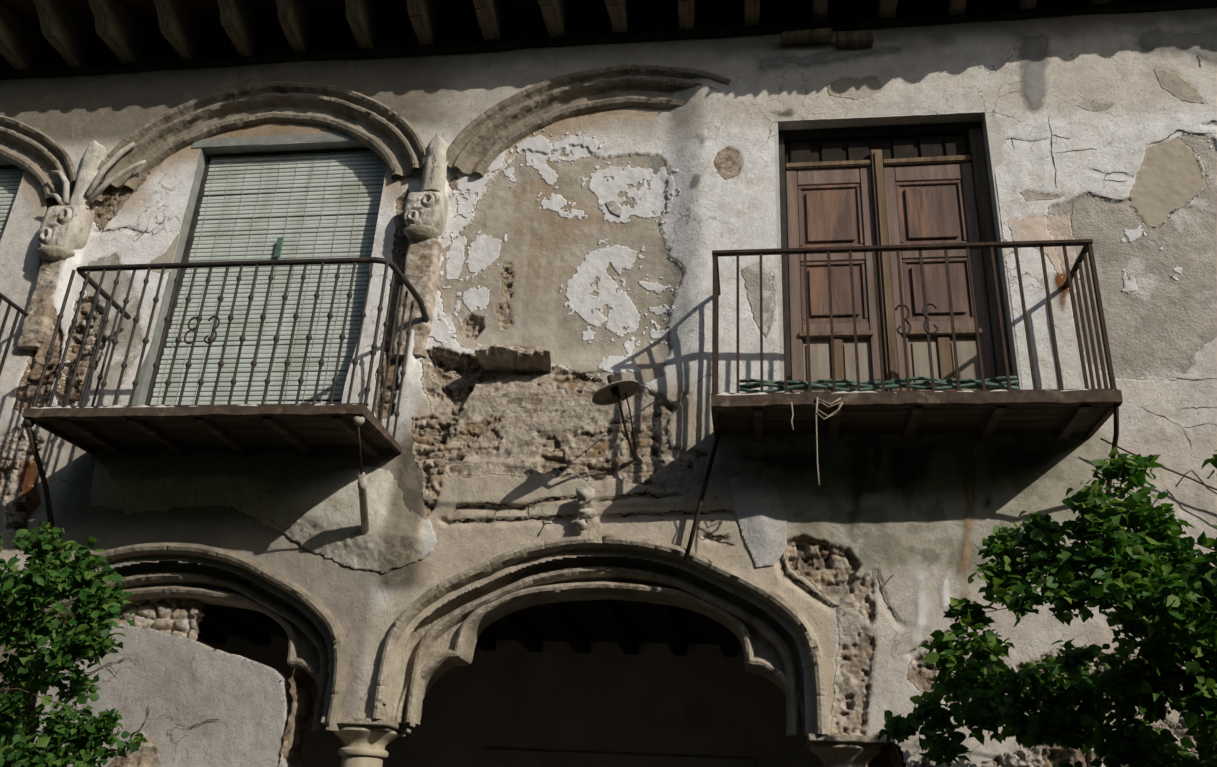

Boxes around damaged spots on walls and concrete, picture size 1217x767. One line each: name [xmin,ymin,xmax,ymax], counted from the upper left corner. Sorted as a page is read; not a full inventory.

flaking render [825,76,883,100]
flaking render [713,146,743,180]
crack [1009,118,1202,229]
flaking render [1007,133,1217,382]
flaking render [375,190,409,420]
flaking render [412,129,717,516]
flaking render [0,252,143,536]
rust [18,459,40,522]
flaking render [907,638,993,704]
flaking render [1089,654,1143,676]
flaking render [913,739,1106,767]
flaking render [1153,714,1217,759]